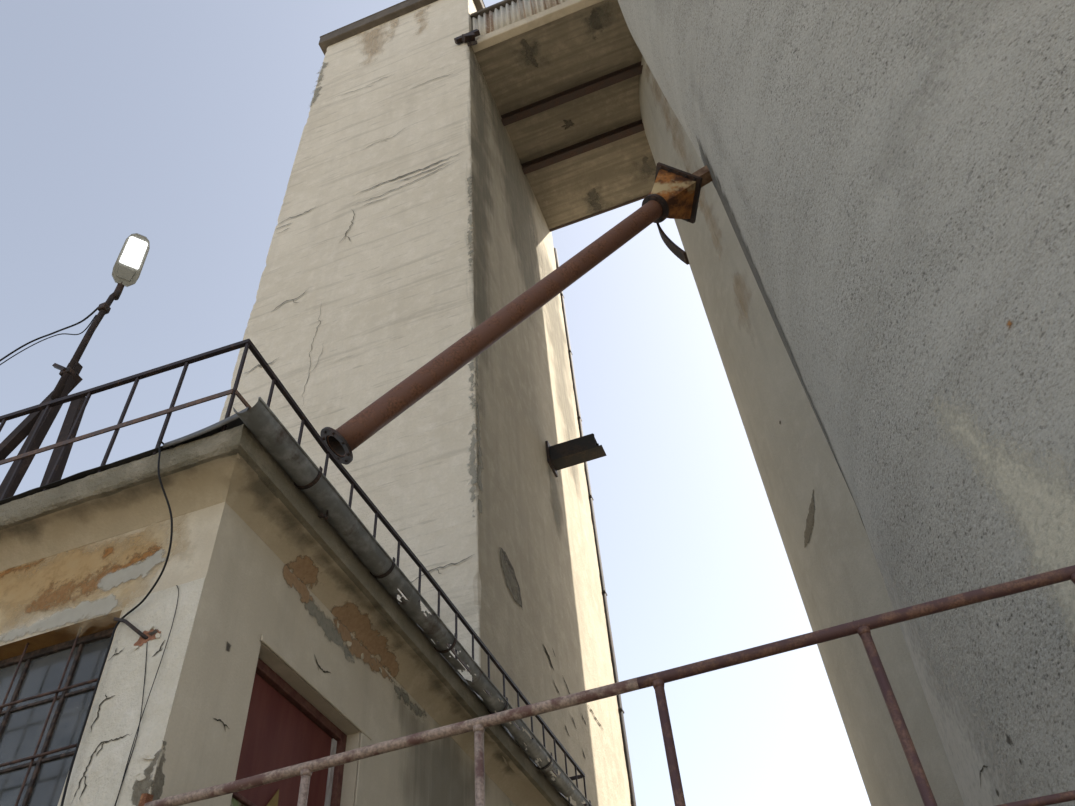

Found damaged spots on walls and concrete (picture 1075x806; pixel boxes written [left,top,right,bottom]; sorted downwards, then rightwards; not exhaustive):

crack [273,289,323,406]
spalling [132,625,161,650]
peeling [283,555,426,717]
crack [71,695,129,804]